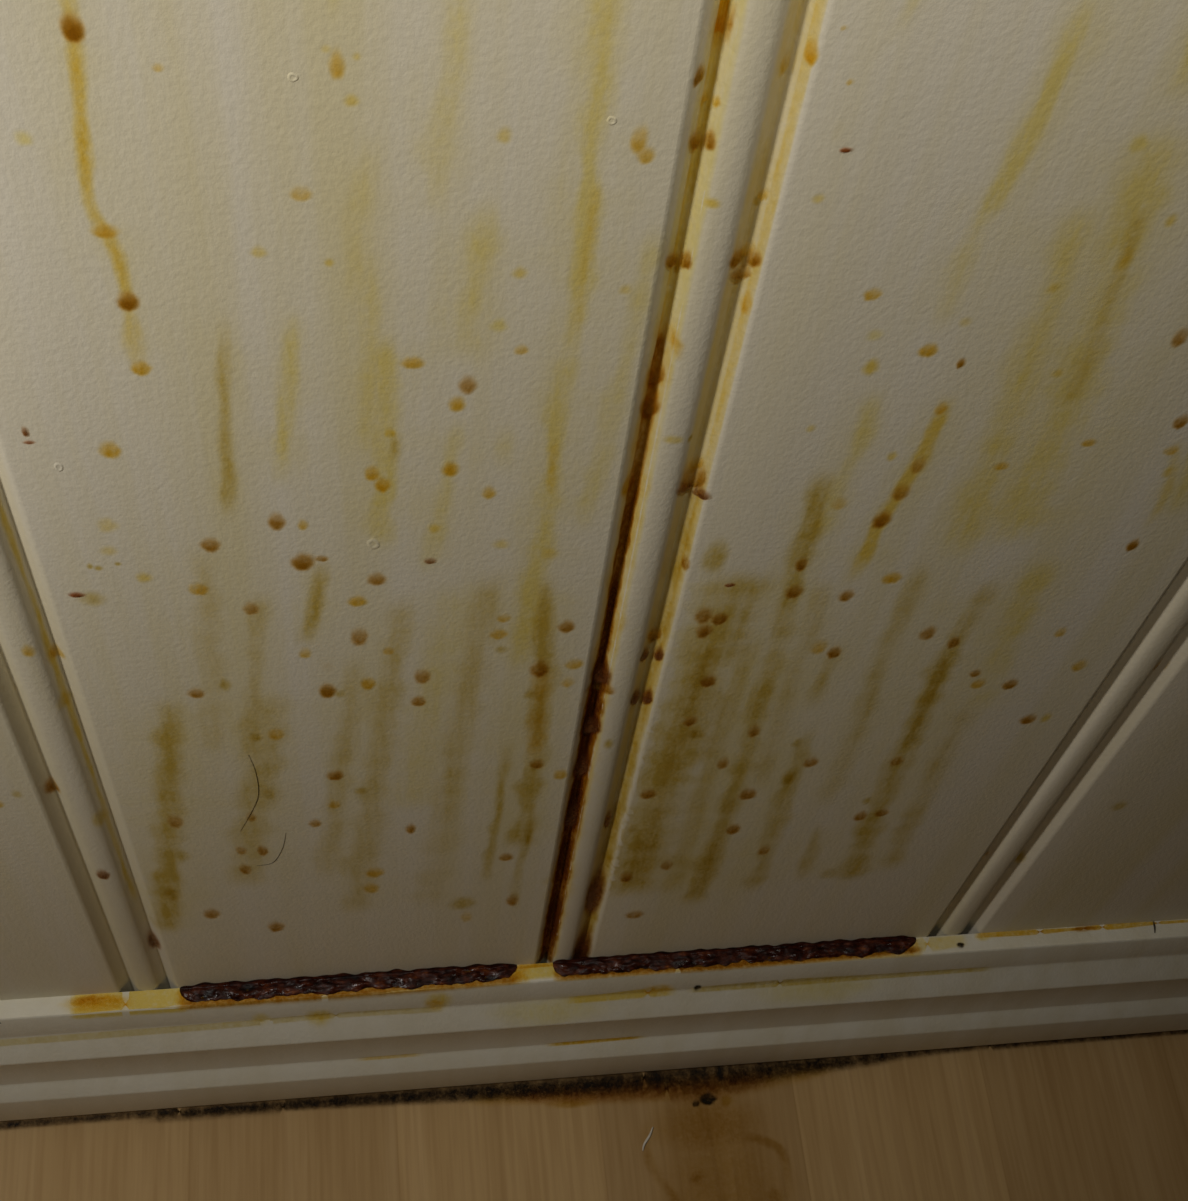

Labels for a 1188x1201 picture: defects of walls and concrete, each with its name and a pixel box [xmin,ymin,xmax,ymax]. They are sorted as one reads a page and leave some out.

corrosion [553,935,916,977]
corrosion [180,963,517,1002]